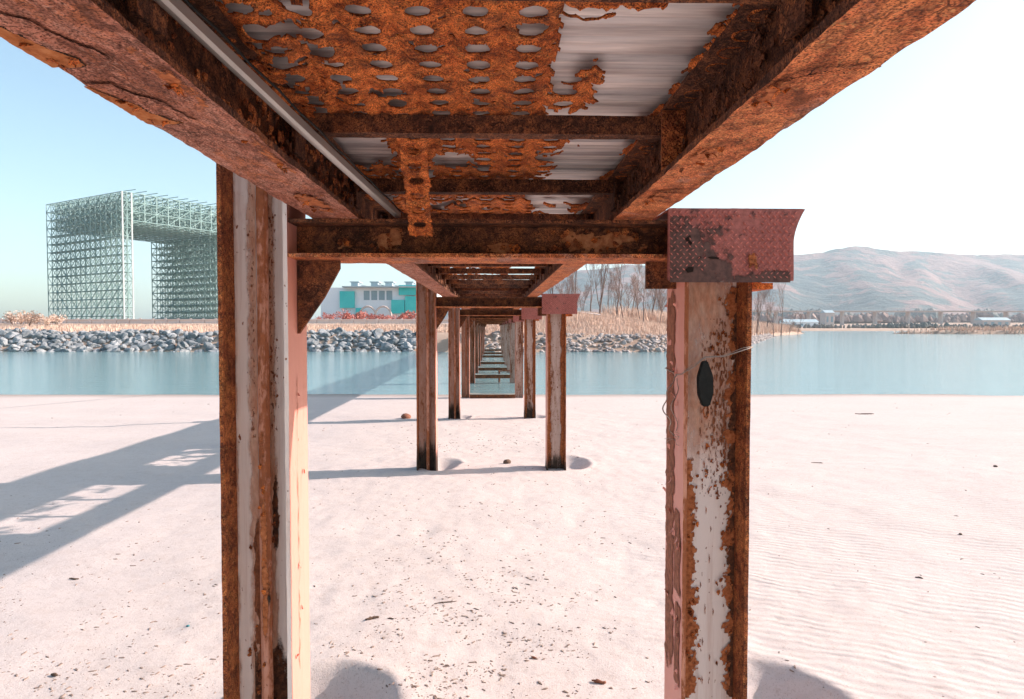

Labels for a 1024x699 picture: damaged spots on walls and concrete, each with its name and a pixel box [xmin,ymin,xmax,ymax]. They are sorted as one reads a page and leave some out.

corrosion [126,46,211,111]
corrosion [744,72,799,114]
corrosion [221,78,356,213]
corrosion [366,227,403,253]
corrosion [487,242,520,254]
corrosion [535,228,648,254]
corrosion [246,181,288,699]
corrosion [663,216,791,698]